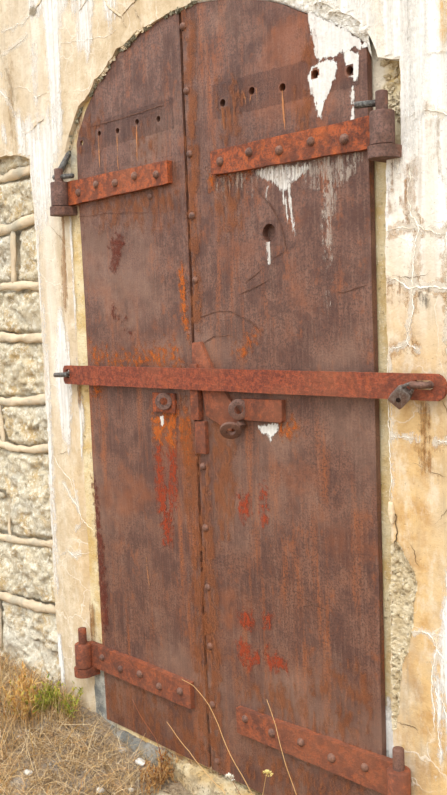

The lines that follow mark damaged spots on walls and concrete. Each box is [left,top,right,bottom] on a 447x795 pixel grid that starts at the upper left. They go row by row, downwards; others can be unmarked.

crack [0,0,45,135]
crack [63,0,141,43]
spalling [163,0,213,19]
spalling [265,0,401,122]
damp [325,0,431,167]
crack [386,162,447,373]
crack [387,401,447,566]
spalling [389,541,418,731]
damp [431,574,447,763]